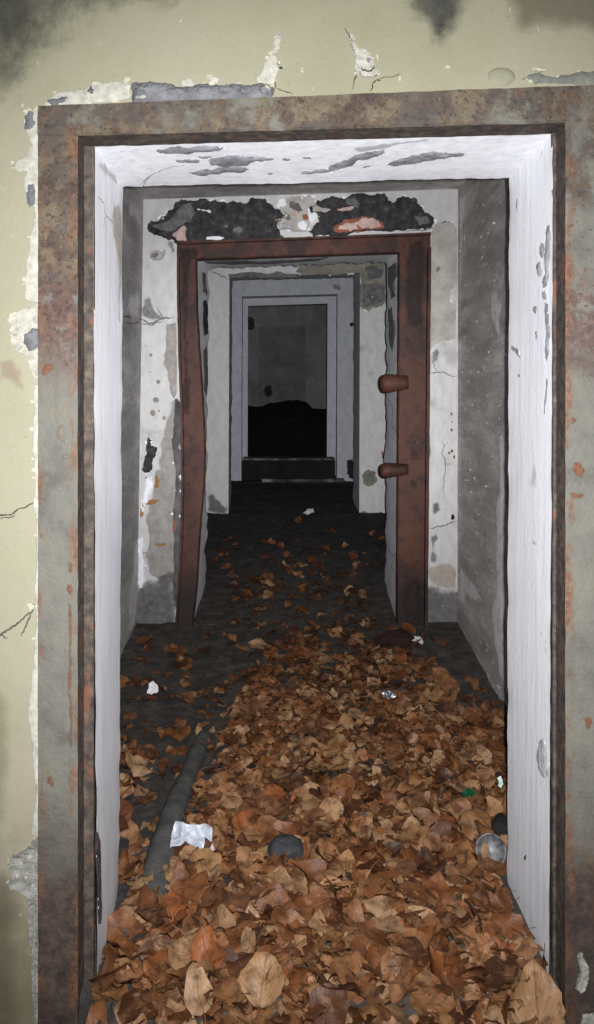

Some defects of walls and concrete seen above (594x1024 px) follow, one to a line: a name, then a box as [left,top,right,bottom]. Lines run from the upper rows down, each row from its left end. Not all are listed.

spalling [349,34,380,79]
peeling [523,68,594,86]
peeling [300,150,464,174]
peeling [145,193,437,261]
peeling [533,225,551,361]
corrosion [573,463,584,478]
crack [0,502,33,519]
spalling [6,32,290,1024]
corrosion [140,476,159,517]
crack [0,609,34,639]
peeling [575,952,589,993]
peeling [581,1013,594,1024]